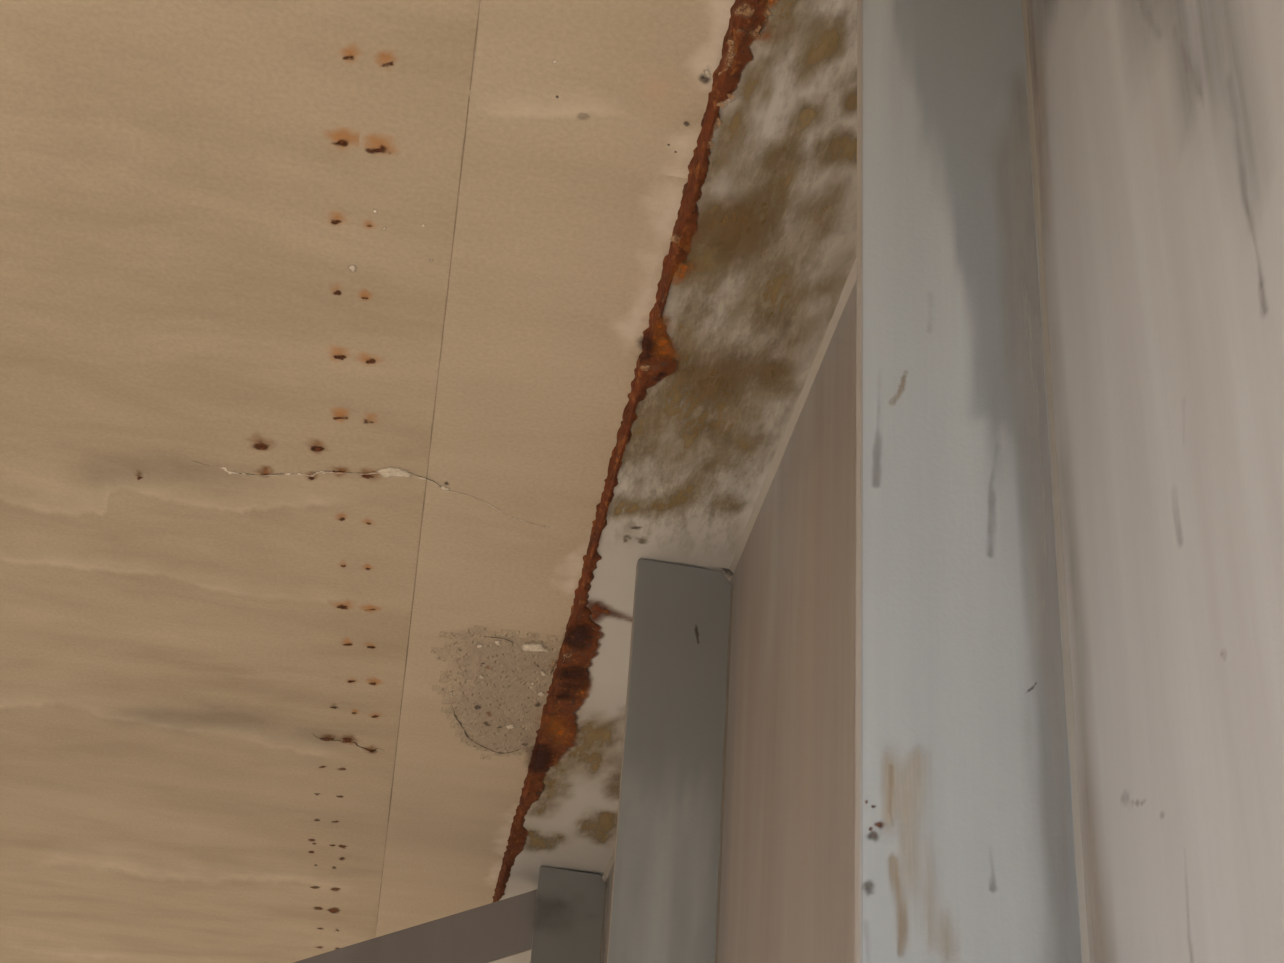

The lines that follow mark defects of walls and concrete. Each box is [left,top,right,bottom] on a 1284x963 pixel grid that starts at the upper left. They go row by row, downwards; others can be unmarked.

damp [675,0,735,98]
damp [469,80,637,122]
rust [317,123,404,161]
damp [603,120,702,360]
rust [622,318,792,463]
crack [191,460,549,528]
rust [609,469,704,544]
damp [863,0,1065,963]
damp [545,525,592,599]
rust [588,602,632,622]
spalling [430,625,590,772]
rust [581,812,618,844]